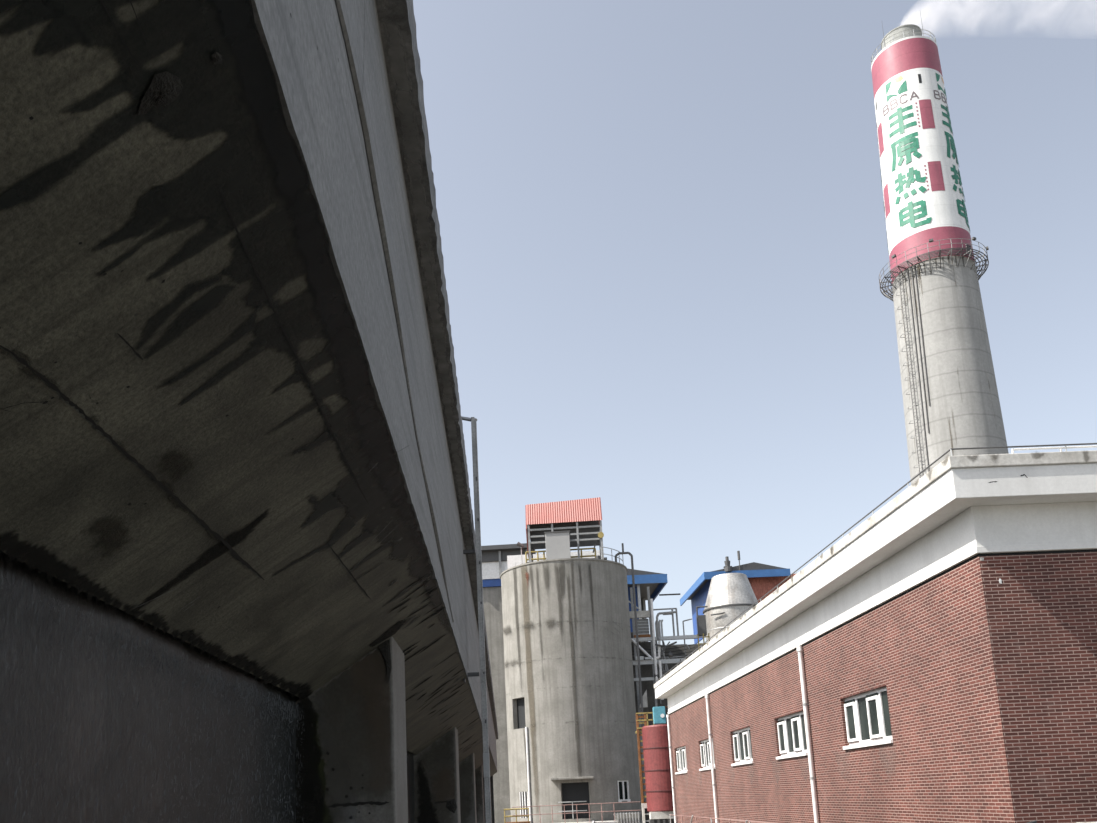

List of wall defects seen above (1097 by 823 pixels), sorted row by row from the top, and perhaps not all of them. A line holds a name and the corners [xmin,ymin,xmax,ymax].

crack [0,345,265,580]
leakage [0,0,450,823]
leakage [405,652,485,823]
leakage [503,564,594,784]